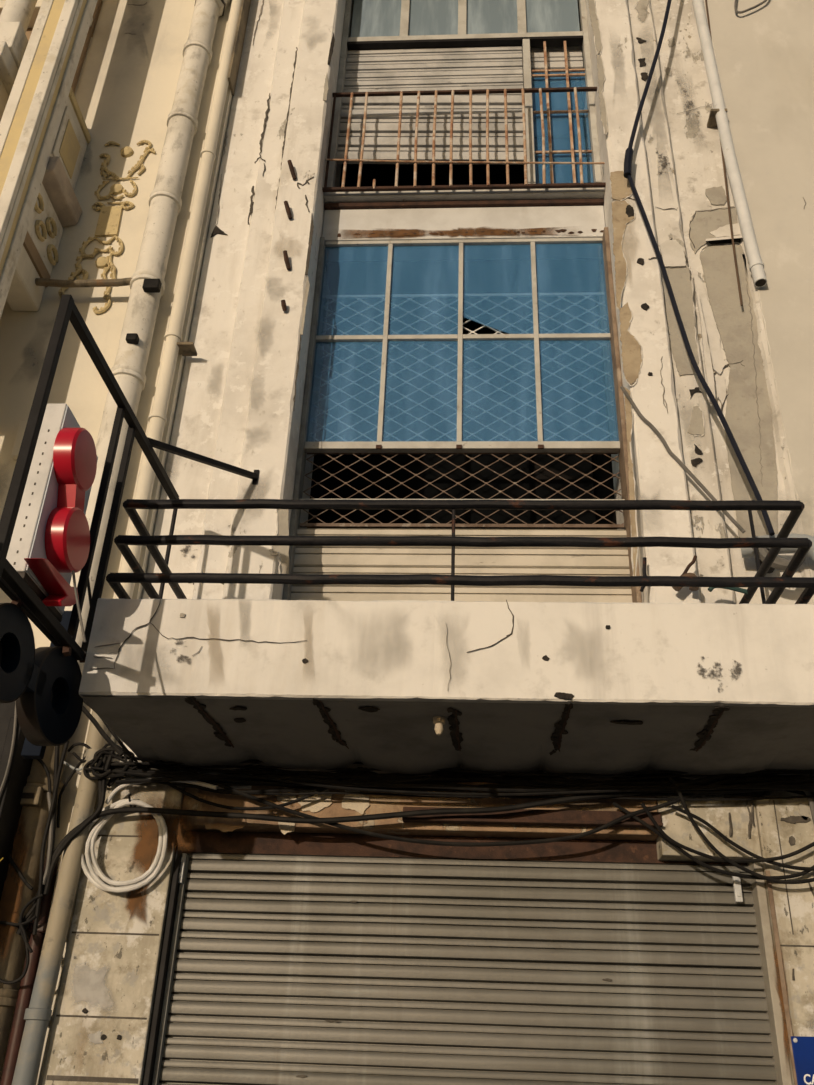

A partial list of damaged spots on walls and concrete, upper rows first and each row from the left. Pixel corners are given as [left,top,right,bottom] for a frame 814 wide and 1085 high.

crack [253,0,264,44]
peeling [636,0,649,22]
flaking render [588,0,608,135]
crack [211,47,314,237]
corrosion [344,227,554,238]
flaking render [610,170,653,576]
flaking render [660,186,779,538]
crack [91,599,307,669]
crack [446,600,514,684]